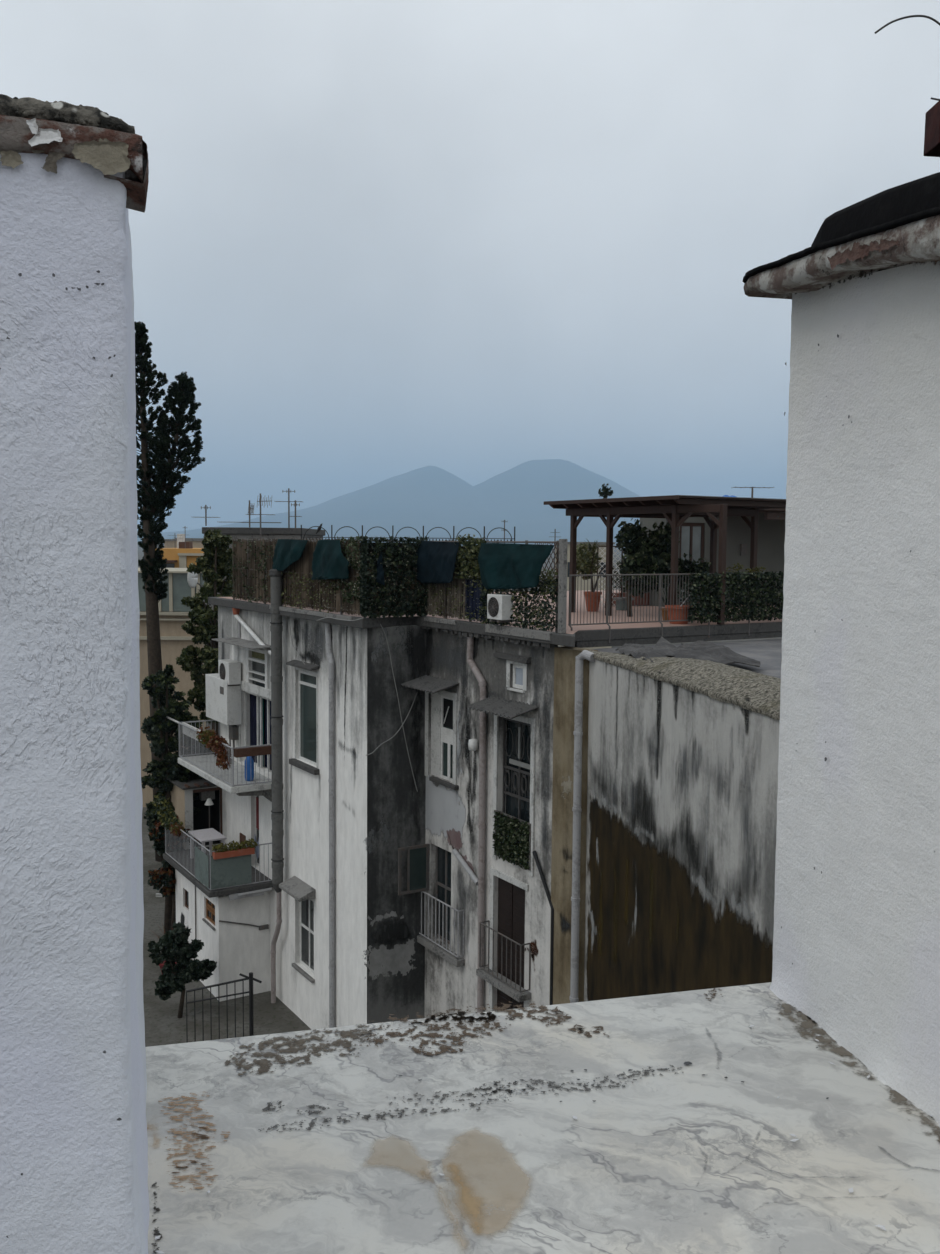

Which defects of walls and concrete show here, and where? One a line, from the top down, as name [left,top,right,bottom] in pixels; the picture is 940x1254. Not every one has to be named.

spalling [0,118,130,175]
peeling [827,239,900,270]
damp [293,619,355,667]
damp [405,628,494,842]
damp [593,672,754,918]